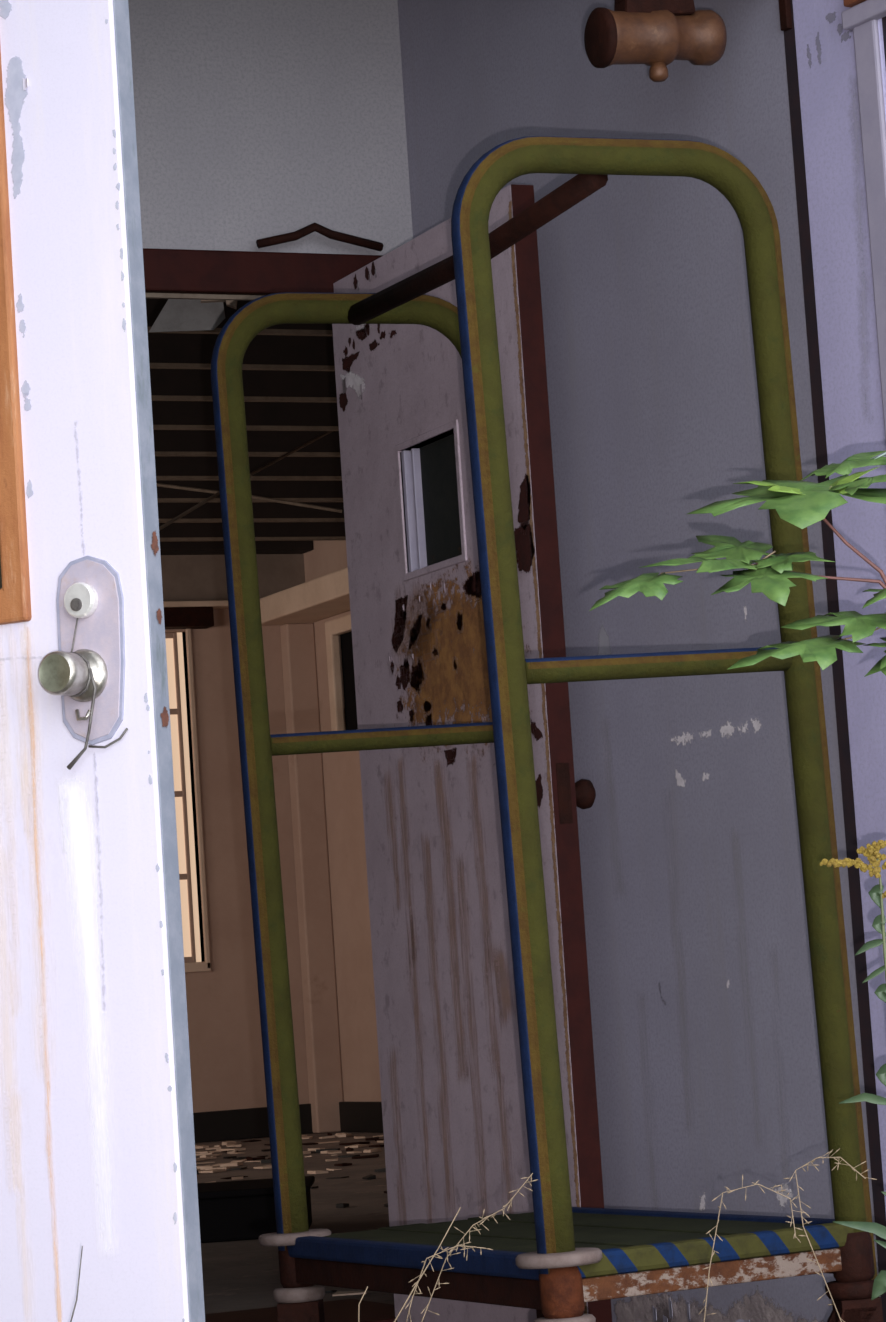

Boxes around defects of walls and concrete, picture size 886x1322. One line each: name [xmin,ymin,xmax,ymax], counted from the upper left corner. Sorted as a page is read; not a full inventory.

peeling [5,56,28,199]
peeling [339,324,397,412]
peeling [462,571,482,598]
peeling [389,582,463,726]
peeling [444,747,457,766]